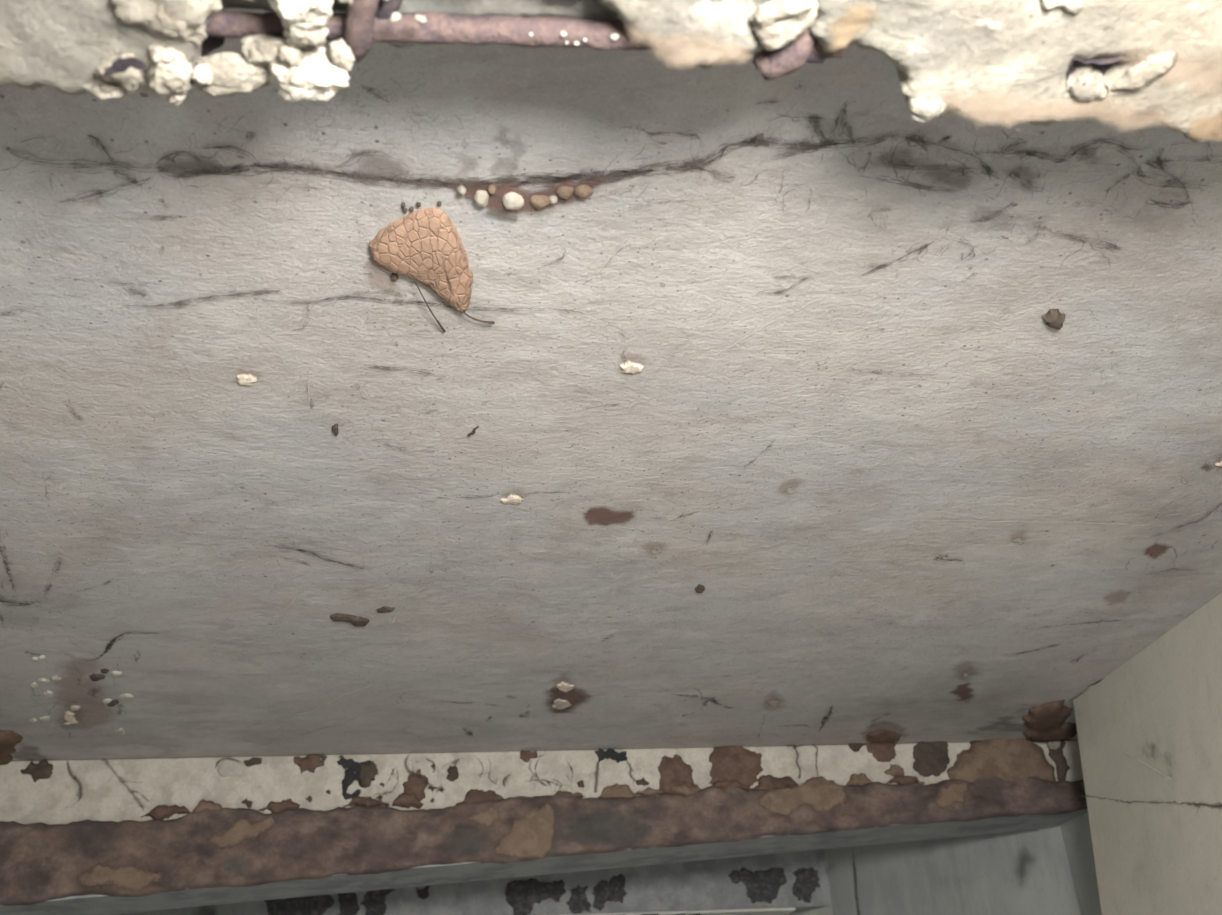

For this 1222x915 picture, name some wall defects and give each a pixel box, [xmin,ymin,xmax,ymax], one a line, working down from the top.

spalling [82,0,659,105]
spalling [750,0,846,80]
rust [585,508,634,526]
rust [1146,544,1169,558]
peeling [293,754,385,801]
spalling [577,745,763,798]
spalling [848,729,950,777]
rust [0,776,1088,906]
peeling [264,888,395,915]
peeling [505,874,627,915]
peeling [728,867,820,904]
crack [852,856,860,915]